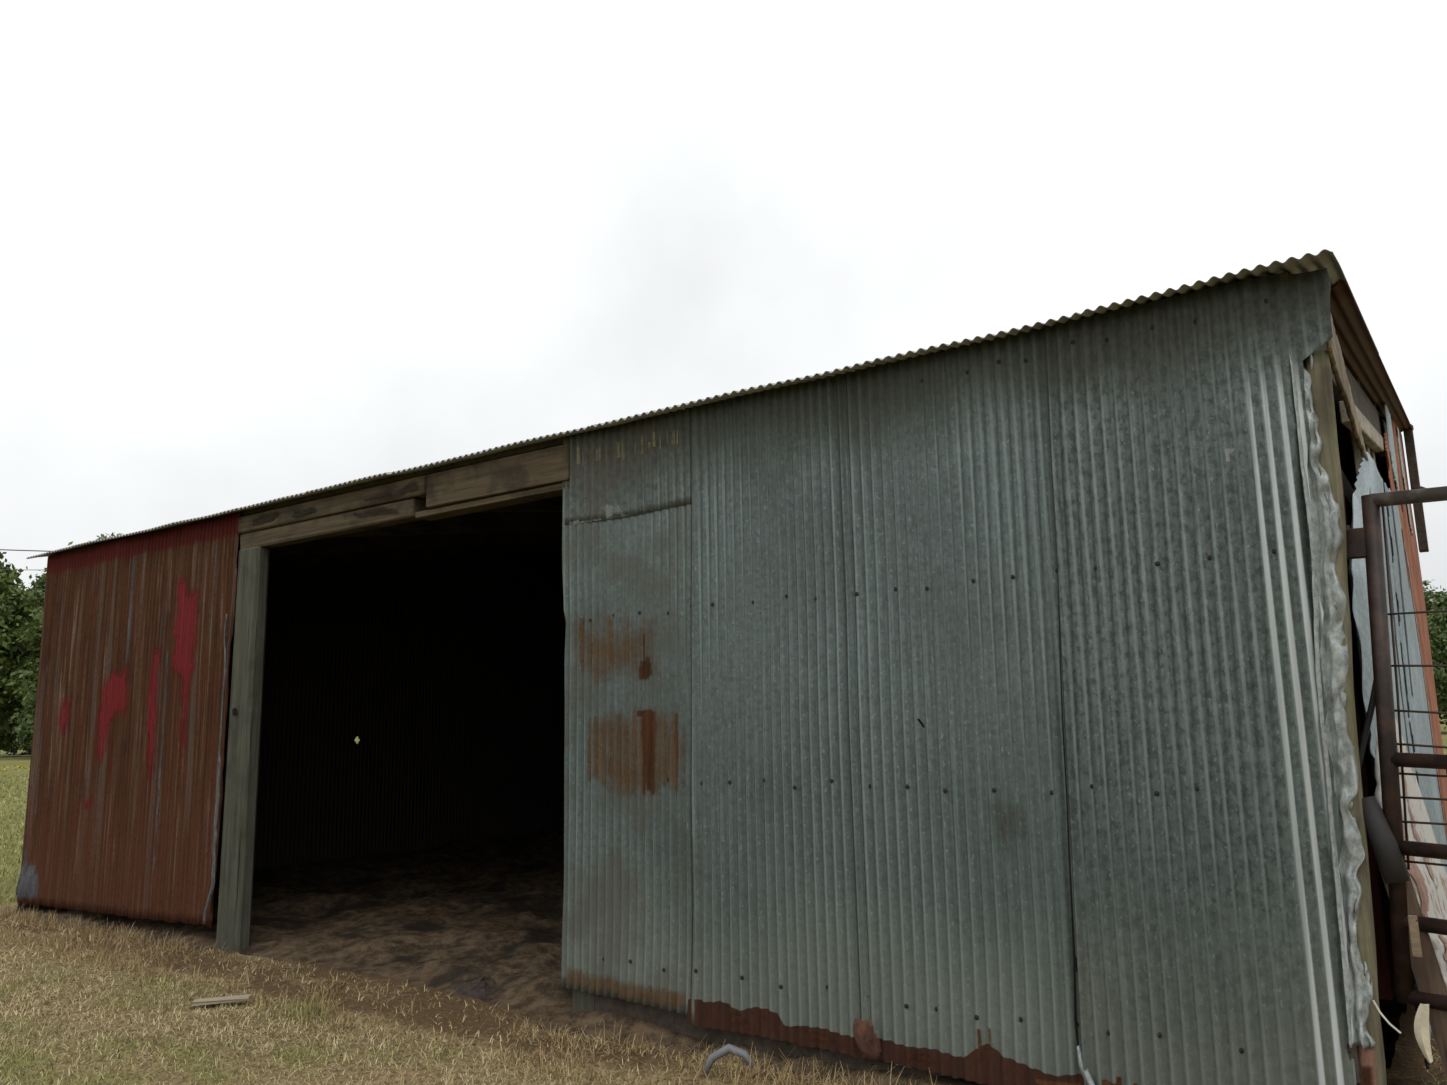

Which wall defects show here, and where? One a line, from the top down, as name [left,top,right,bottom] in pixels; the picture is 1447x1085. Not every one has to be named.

rust [639,635,651,679]
rust [589,710,677,794]
rust [568,972,1084,1085]
rust [1360,1047,1377,1085]